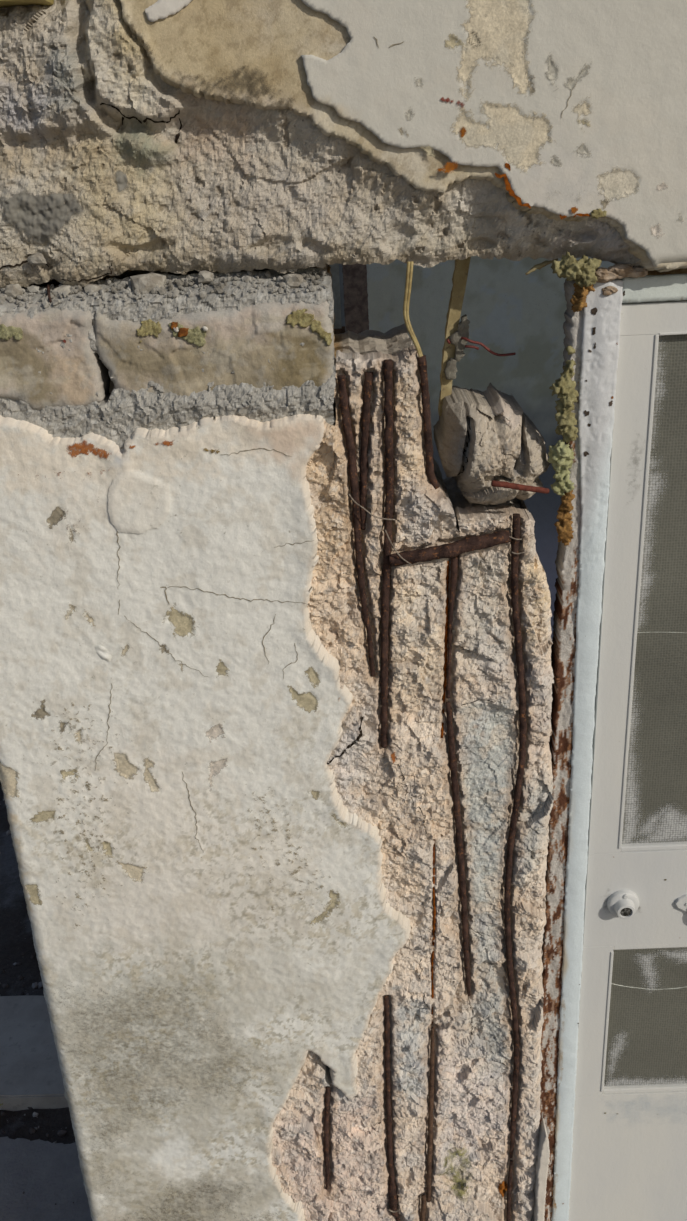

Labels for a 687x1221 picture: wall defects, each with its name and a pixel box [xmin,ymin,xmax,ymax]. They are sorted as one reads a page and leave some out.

crack [100,103,182,144]
spalling [0,0,641,334]
rust [68,440,109,478]
peeling [47,507,77,542]
peeling [159,607,195,655]
peeling [31,700,83,742]
crack [326,716,363,764]
rust [539,279,583,1221]
peeling [0,762,19,797]
peeling [114,753,159,792]
spalling [271,345,554,1221]
peeling [30,811,55,823]